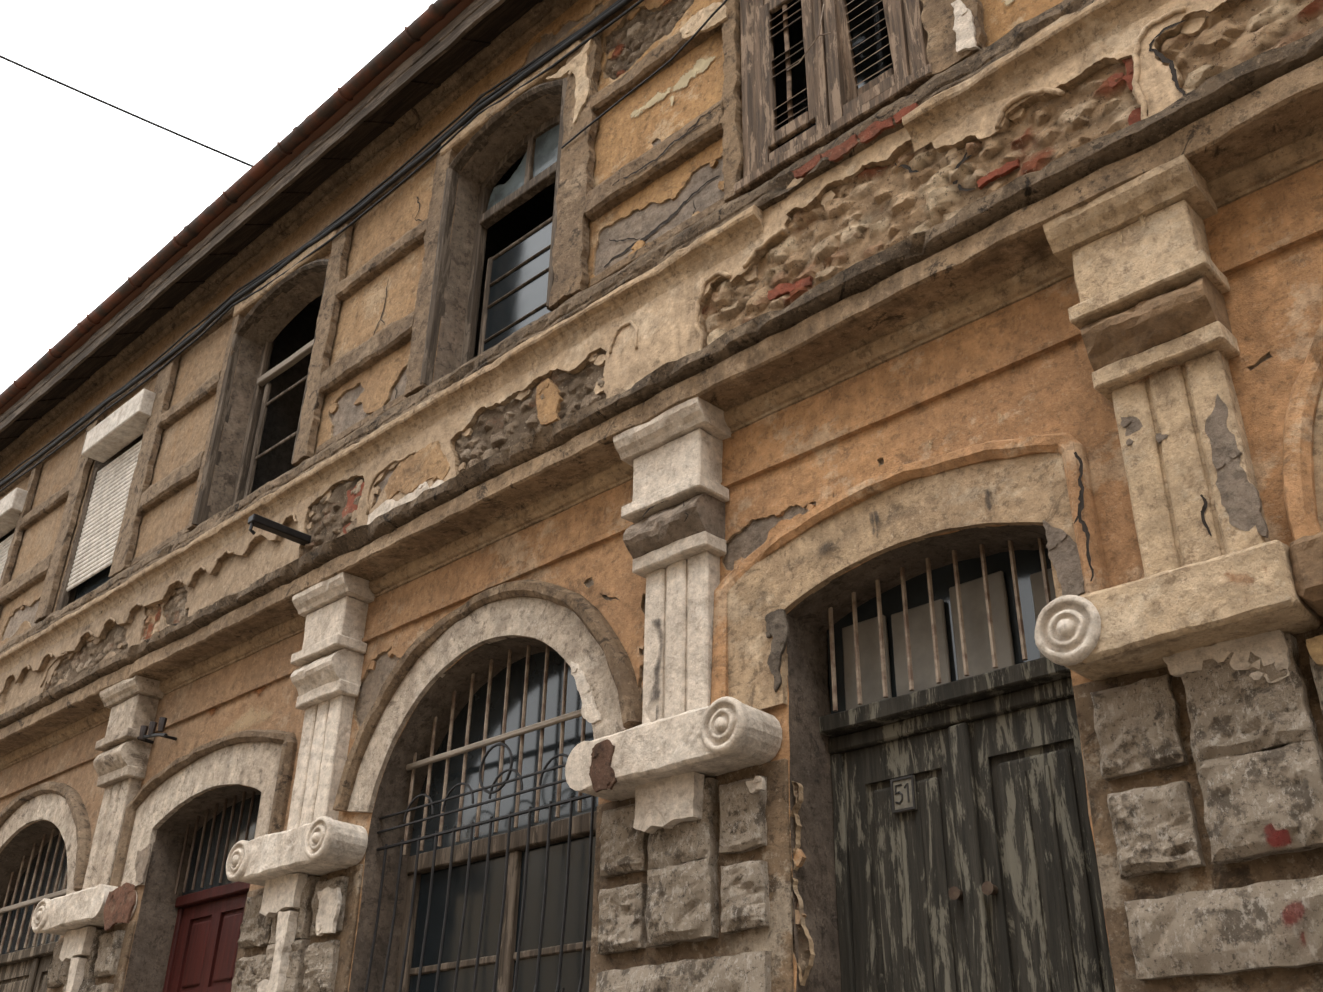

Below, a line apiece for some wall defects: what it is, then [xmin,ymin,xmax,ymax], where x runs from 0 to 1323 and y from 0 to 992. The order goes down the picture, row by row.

spalling [546,0,729,125]
peeling [951,0,981,54]
spalling [1159,0,1323,93]
crack [604,176,719,268]
spalling [701,57,1148,346]
spalling [303,349,607,554]
spalling [1205,393,1269,538]
spalling [45,587,189,691]